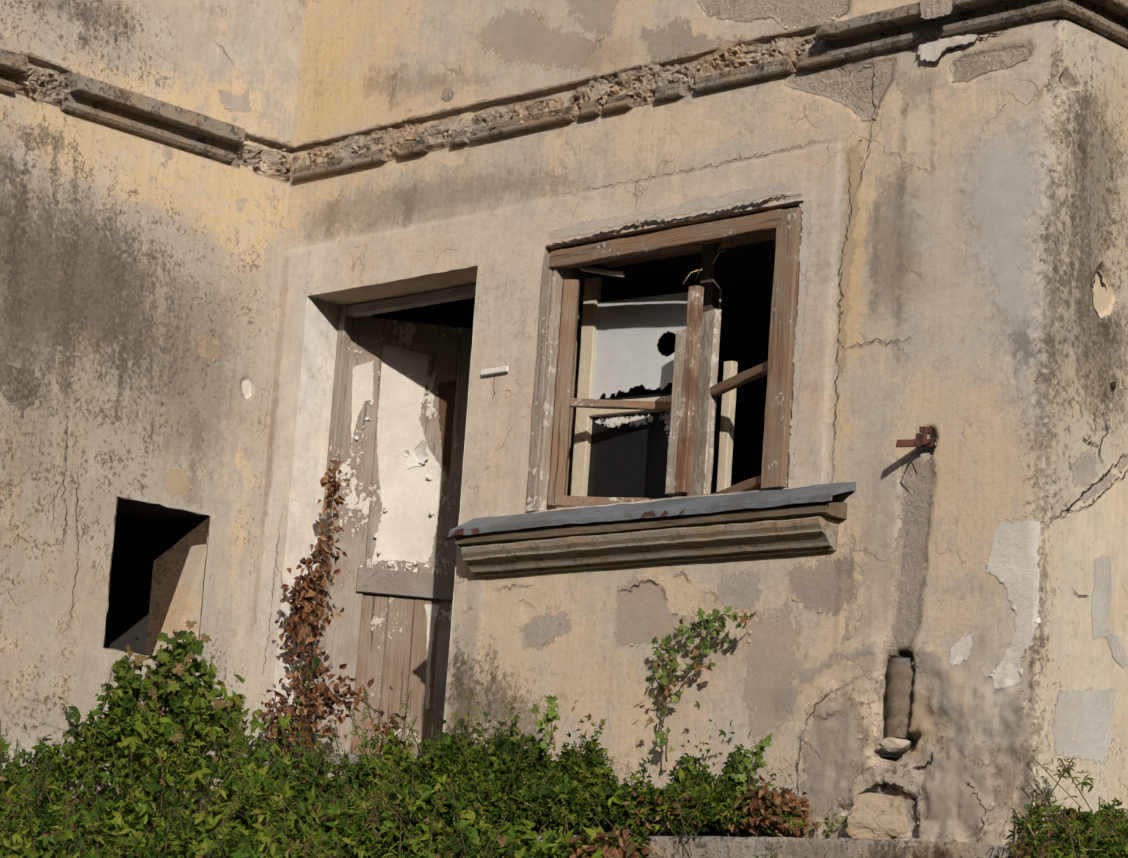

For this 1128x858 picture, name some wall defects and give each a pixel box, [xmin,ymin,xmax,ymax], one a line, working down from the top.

spalling [918,34,1032,83]
crack [546,138,830,246]
crack [832,57,911,481]
spalling [1091,267,1116,318]
spalling [241,378,252,399]
peeling [350,345,457,570]
crack [1056,410,1128,518]
peeling [718,571,762,612]
peeling [786,554,858,616]
spalling [798,428,1001,842]
peeling [986,519,1041,691]